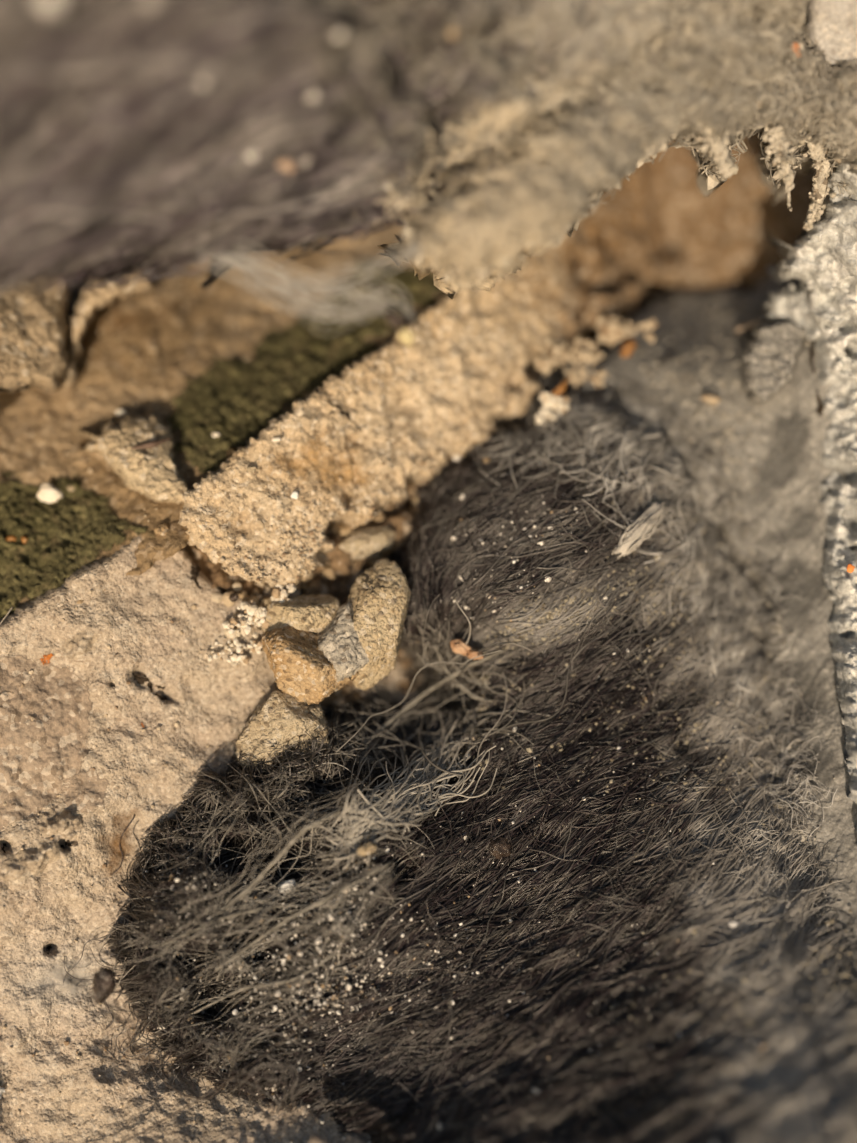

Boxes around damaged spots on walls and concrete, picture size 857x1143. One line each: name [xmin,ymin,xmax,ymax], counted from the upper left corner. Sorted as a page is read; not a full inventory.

peeling [701,394,720,405]
peeling [450,639,484,660]